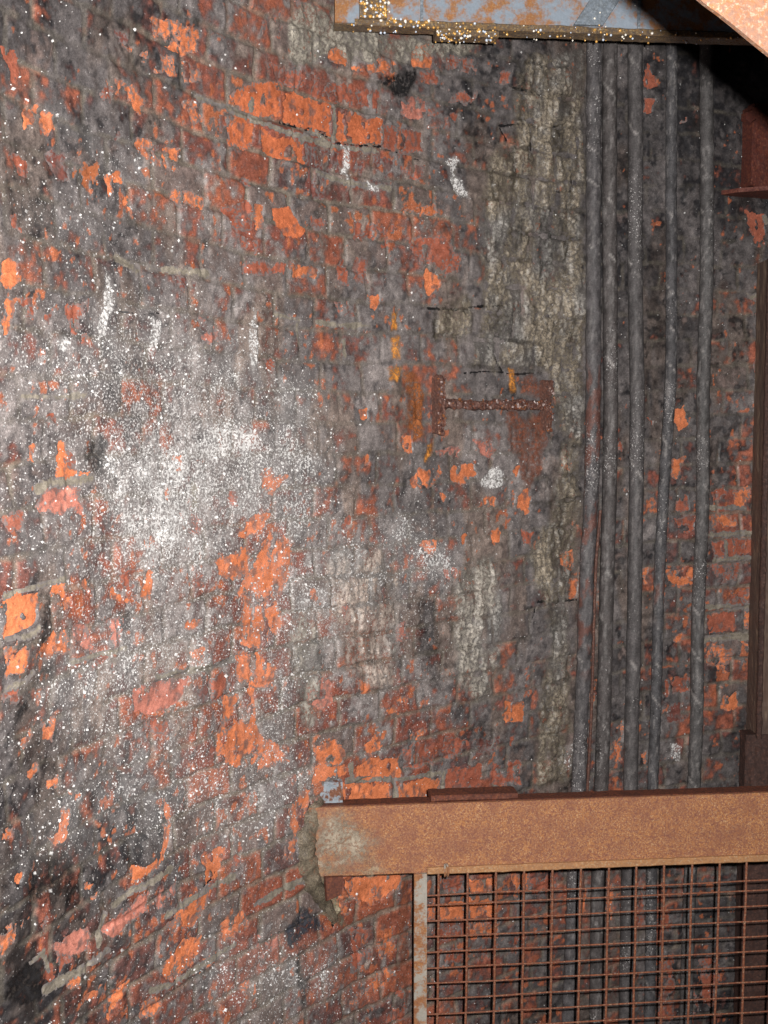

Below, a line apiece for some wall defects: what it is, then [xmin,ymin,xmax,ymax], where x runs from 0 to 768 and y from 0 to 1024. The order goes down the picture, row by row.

spalling [218,44,478,200]
spalling [495,70,511,85]
rust [390,313,432,460]
water stain [433,52,586,785]
spalling [179,481,202,535]
spalling [0,583,124,705]
spalling [132,512,292,772]
water stain [16,276,504,903]
spalling [27,762,39,779]
spalling [20,715,56,750]
spalling [283,696,525,861]